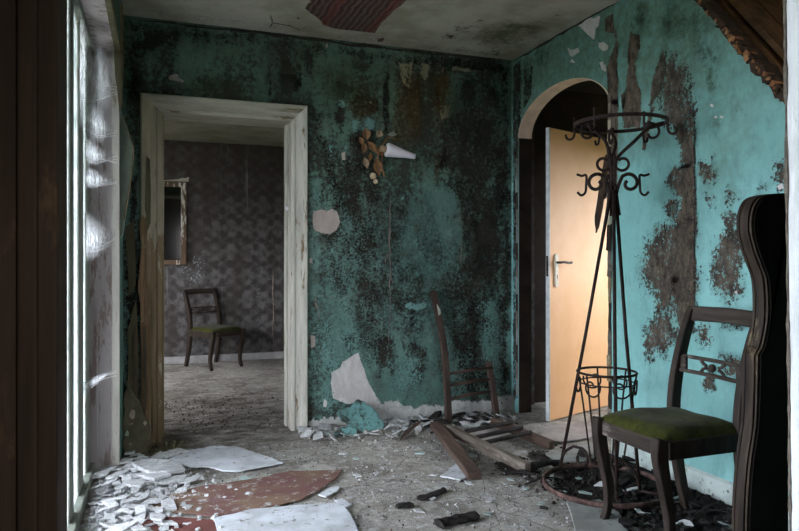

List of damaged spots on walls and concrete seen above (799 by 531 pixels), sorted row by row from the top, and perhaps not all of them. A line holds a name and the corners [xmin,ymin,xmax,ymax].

spalling [305,0,405,42]
leakage [125,22,327,116]
spalling [313,209,340,234]
leakage [312,46,542,401]
peeling [577,14,747,364]
leakage [124,175,140,398]
peeling [308,285,492,427]
peeling [458,297,505,384]
peeling [702,353,741,393]